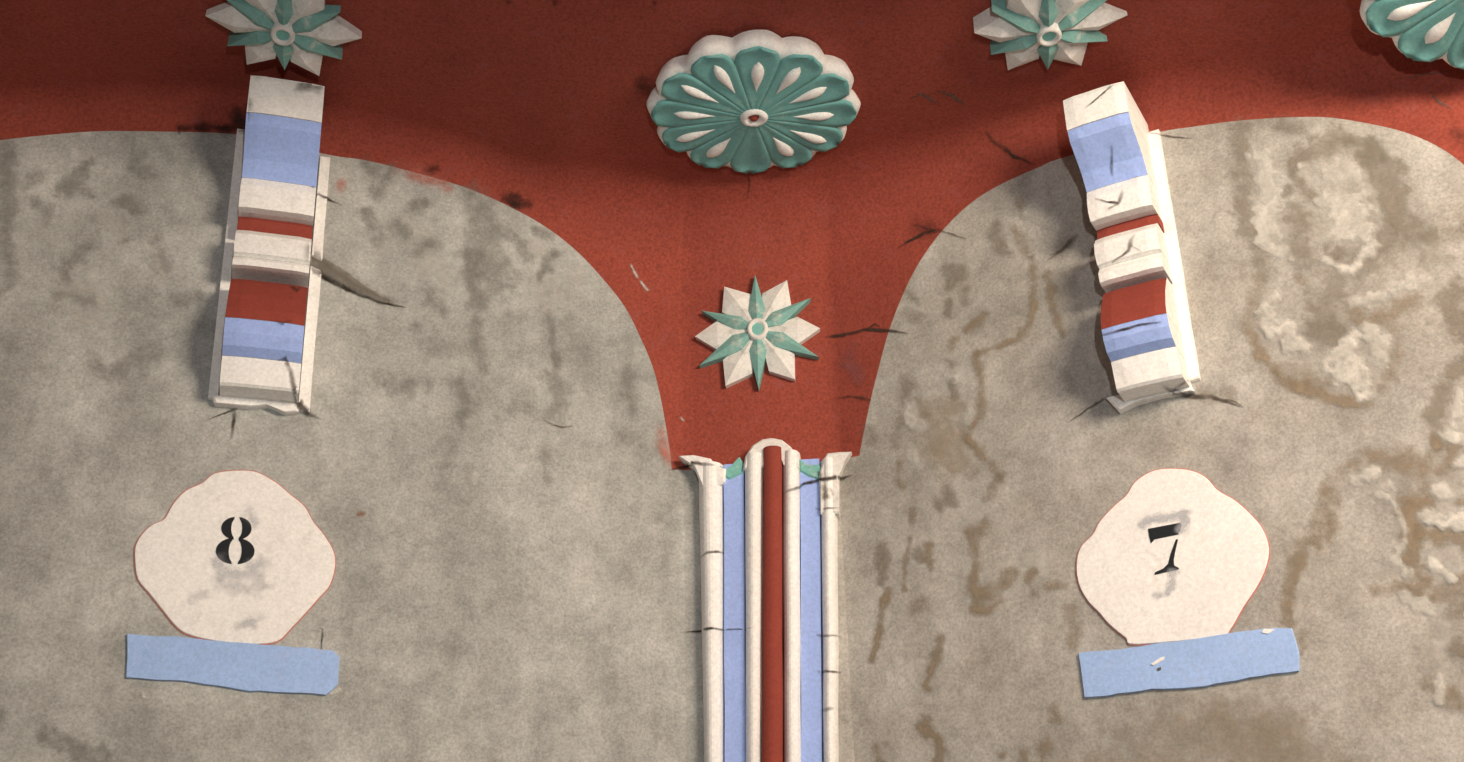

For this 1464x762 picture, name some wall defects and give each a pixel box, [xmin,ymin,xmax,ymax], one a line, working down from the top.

leakage [1237,128,1434,274]
leakage [1349,271,1428,305]
crack [284,357,310,415]
crack [831,324,900,337]
leakage [949,257,1061,458]
crack [1116,322,1154,332]
crack [1171,390,1238,406]
leakage [1254,292,1391,407]
leakage [1351,277,1464,615]
crack [796,476,848,508]
crack [688,625,742,633]
leakage [870,538,933,662]